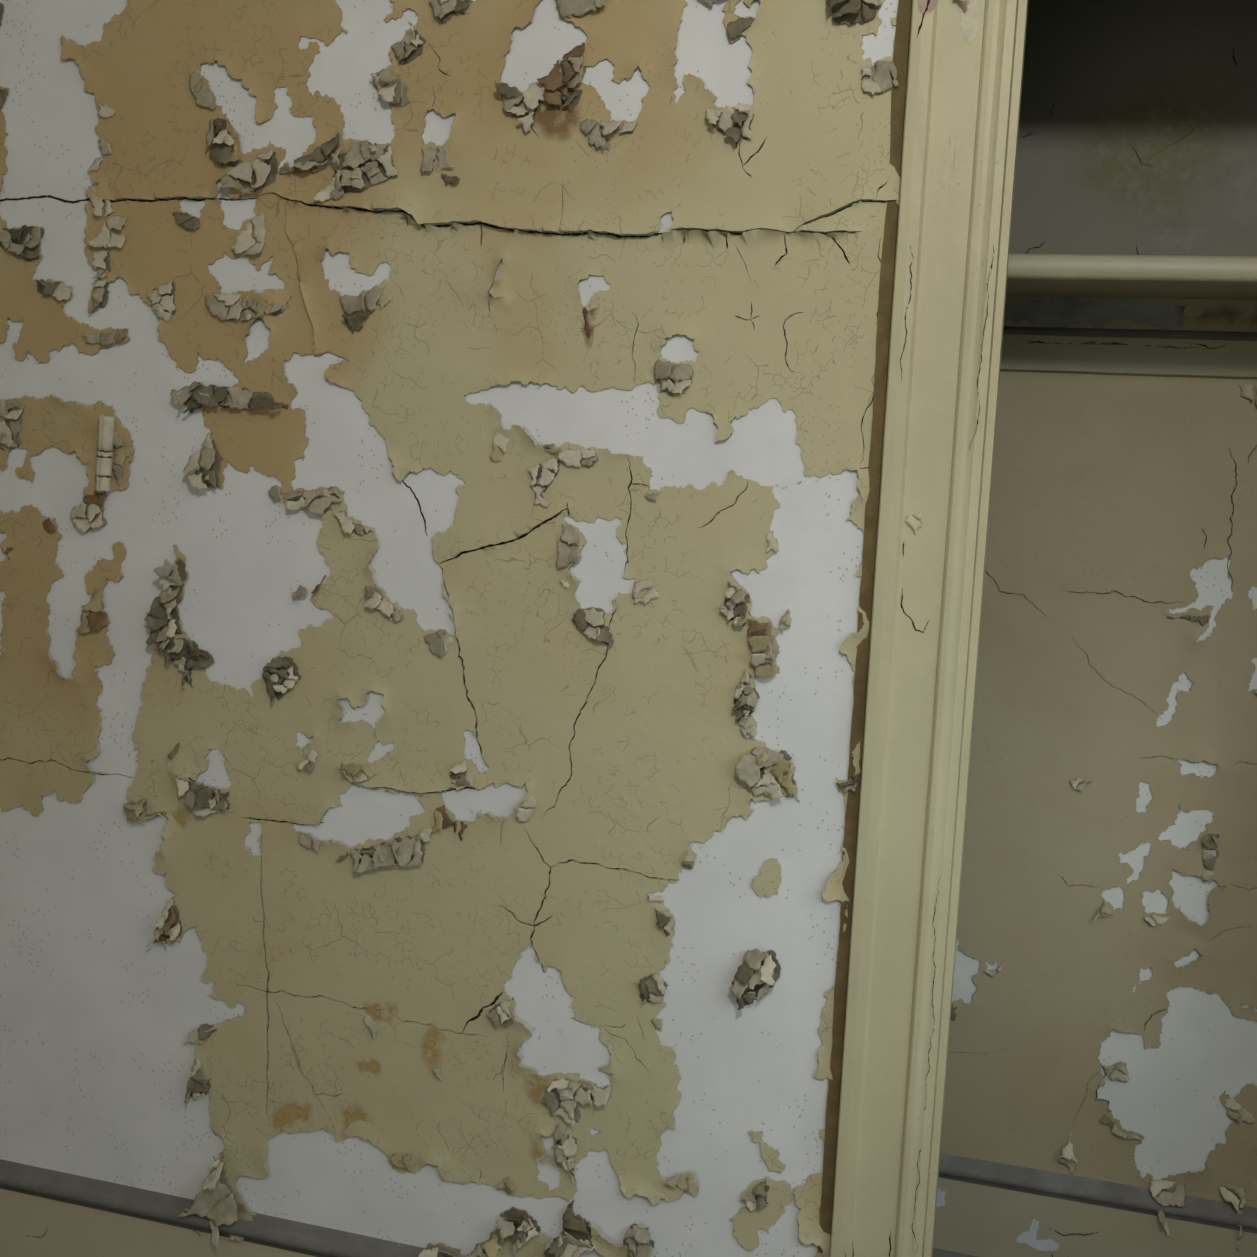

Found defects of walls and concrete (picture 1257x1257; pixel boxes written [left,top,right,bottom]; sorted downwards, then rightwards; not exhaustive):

peeling [827,0,899,95]
crack [0,187,914,382]
crack [402,480,427,535]
peeling [0,0,864,1257]
crack [441,508,569,596]
peeling [1165,556,1257,641]
crack [545,608,617,814]
peeling [1156,671,1194,727]
crack [510,846,673,973]
peeling [1102,803,1224,929]
crack [463,992,503,1035]
peeling [1097,986,1257,1236]